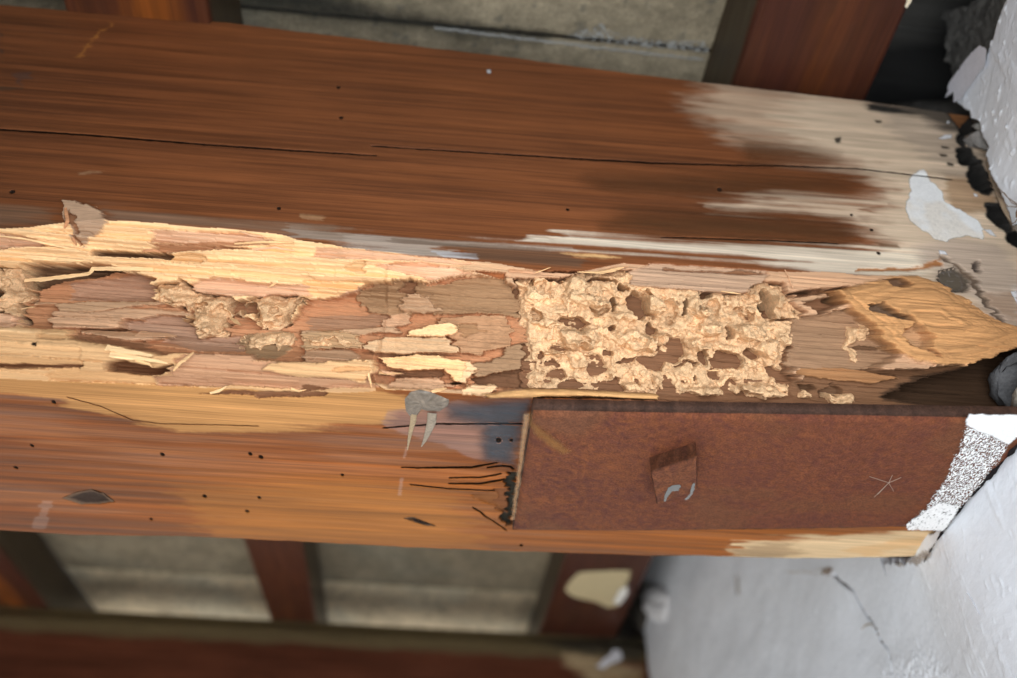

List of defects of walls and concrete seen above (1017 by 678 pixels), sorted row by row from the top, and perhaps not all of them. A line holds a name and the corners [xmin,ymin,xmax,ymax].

crack [0,129,953,180]
spalling [0,200,1017,407]
crack [402,462,514,530]
corrosion [512,415,528,519]
crack [834,576,891,659]